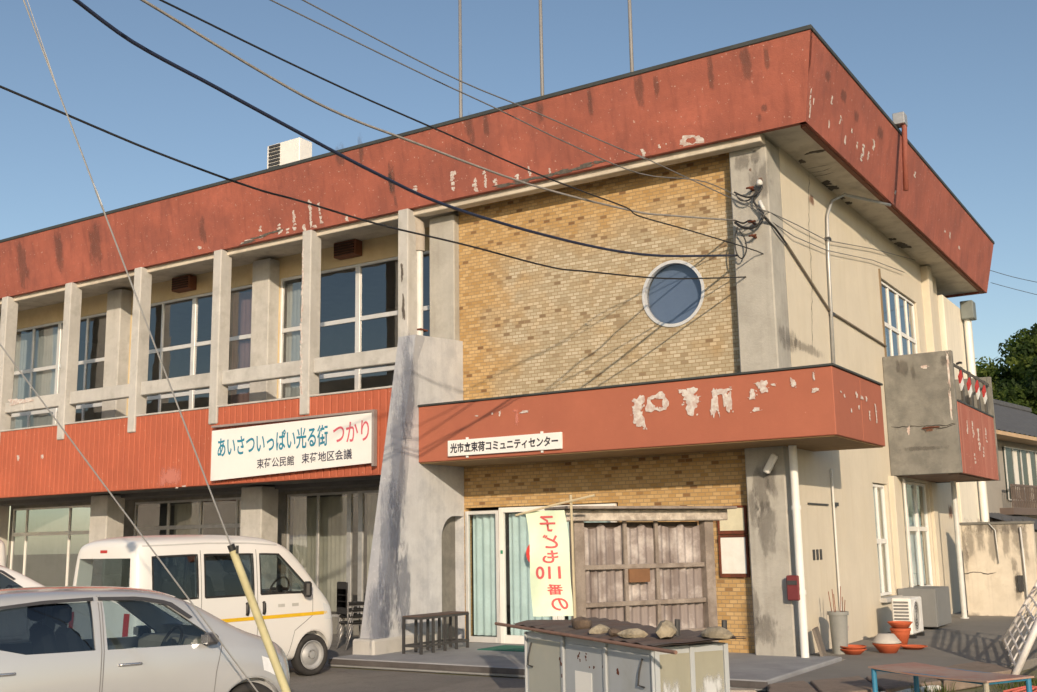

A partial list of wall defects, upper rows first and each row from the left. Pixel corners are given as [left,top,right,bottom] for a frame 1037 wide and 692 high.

peeling [680,135,704,147]
peeling [828,115,875,162]
peeling [240,199,323,245]
peeling [632,391,669,429]
peeling [679,387,734,418]
peeling [748,380,776,413]